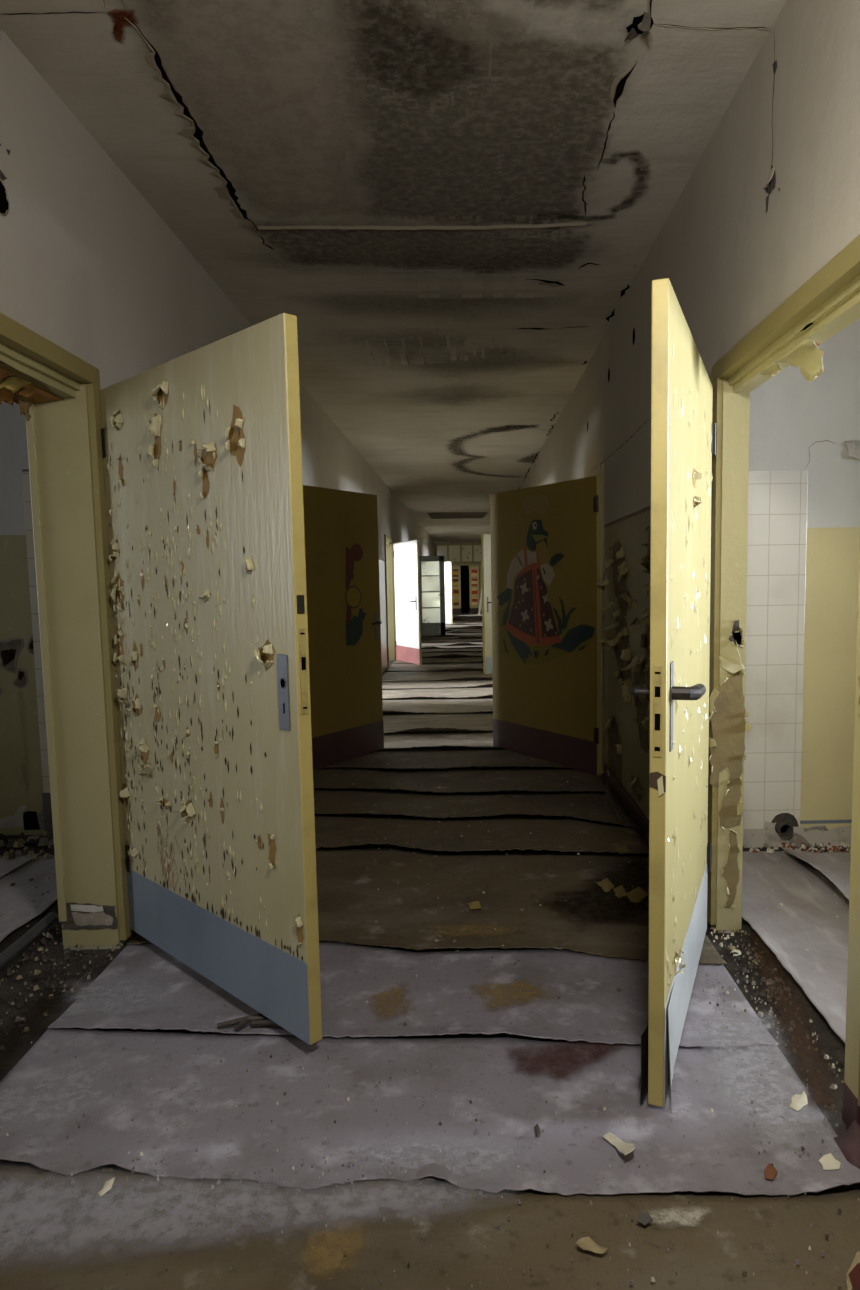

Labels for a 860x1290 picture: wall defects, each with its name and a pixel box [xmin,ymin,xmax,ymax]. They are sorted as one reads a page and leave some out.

crack [0,12,275,251]
water stain [149,0,648,271]
crack [582,59,638,217]
crack [647,0,780,212]
peeling [0,360,64,421]
water stain [449,425,537,477]
peeling [758,339,824,382]
spalling [0,634,34,787]
peeling [597,525,675,802]
peeling [666,468,852,986]
spalling [0,805,44,830]